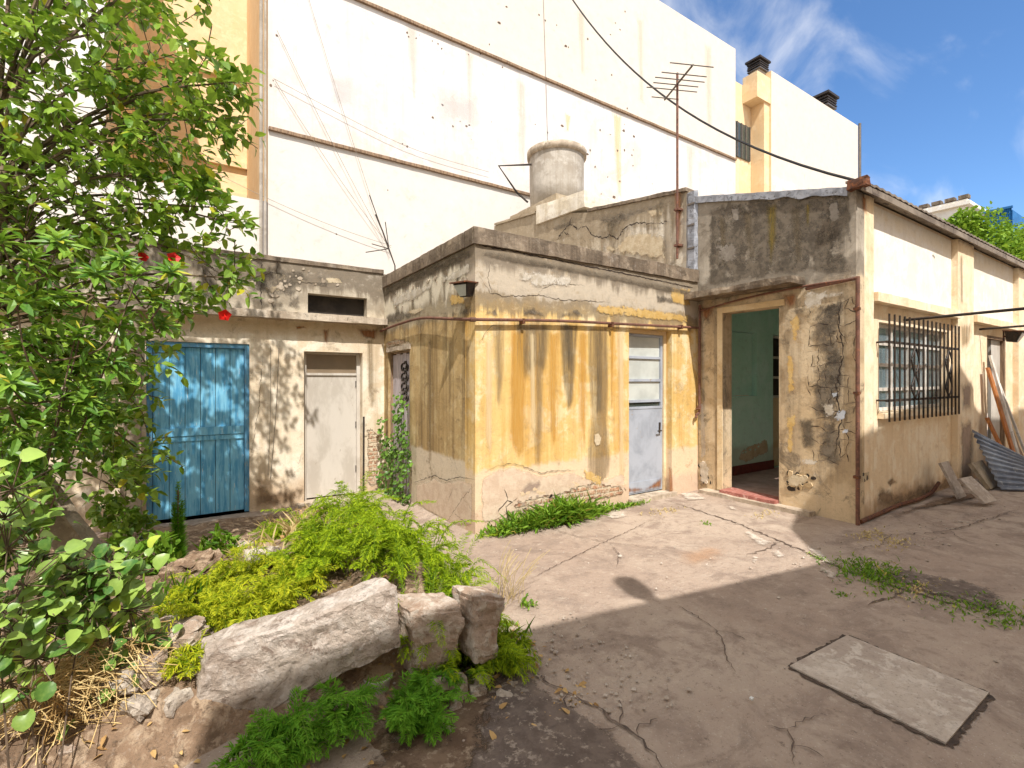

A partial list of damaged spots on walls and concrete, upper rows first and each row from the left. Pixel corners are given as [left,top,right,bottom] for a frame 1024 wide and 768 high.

peeling [250,267,342,303]
crack [482,218,693,303]
peeling [597,288,690,322]
leakage [709,195,851,284]
leakage [518,309,623,481]
crack [808,294,855,464]
peeling [416,468,627,524]
spalling [786,470,816,491]
crack [671,501,1024,622]
crack [682,607,743,669]